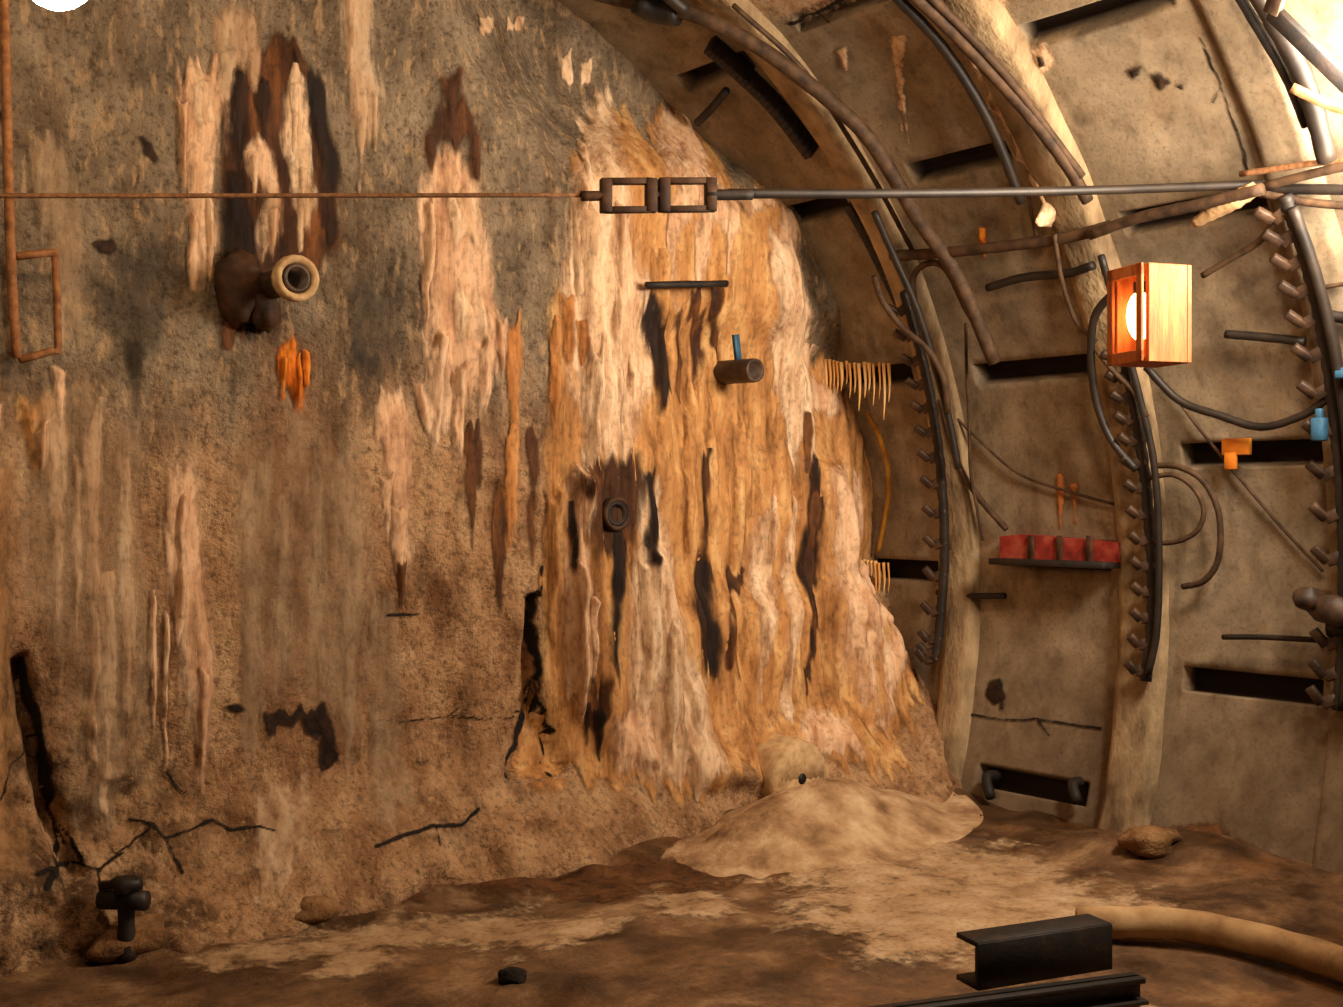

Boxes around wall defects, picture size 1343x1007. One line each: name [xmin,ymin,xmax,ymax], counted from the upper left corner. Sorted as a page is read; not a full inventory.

leakage [177,11,260,291]
leakage [245,62,317,259]
corrosion [641,287,725,410]
corrosion [693,448,744,679]
corrosion [796,411,824,695]
crack [0,656,275,890]
spalling [228,704,244,712]
spalling [264,701,339,770]
crack [375,807,480,848]
crack [378,565,556,779]